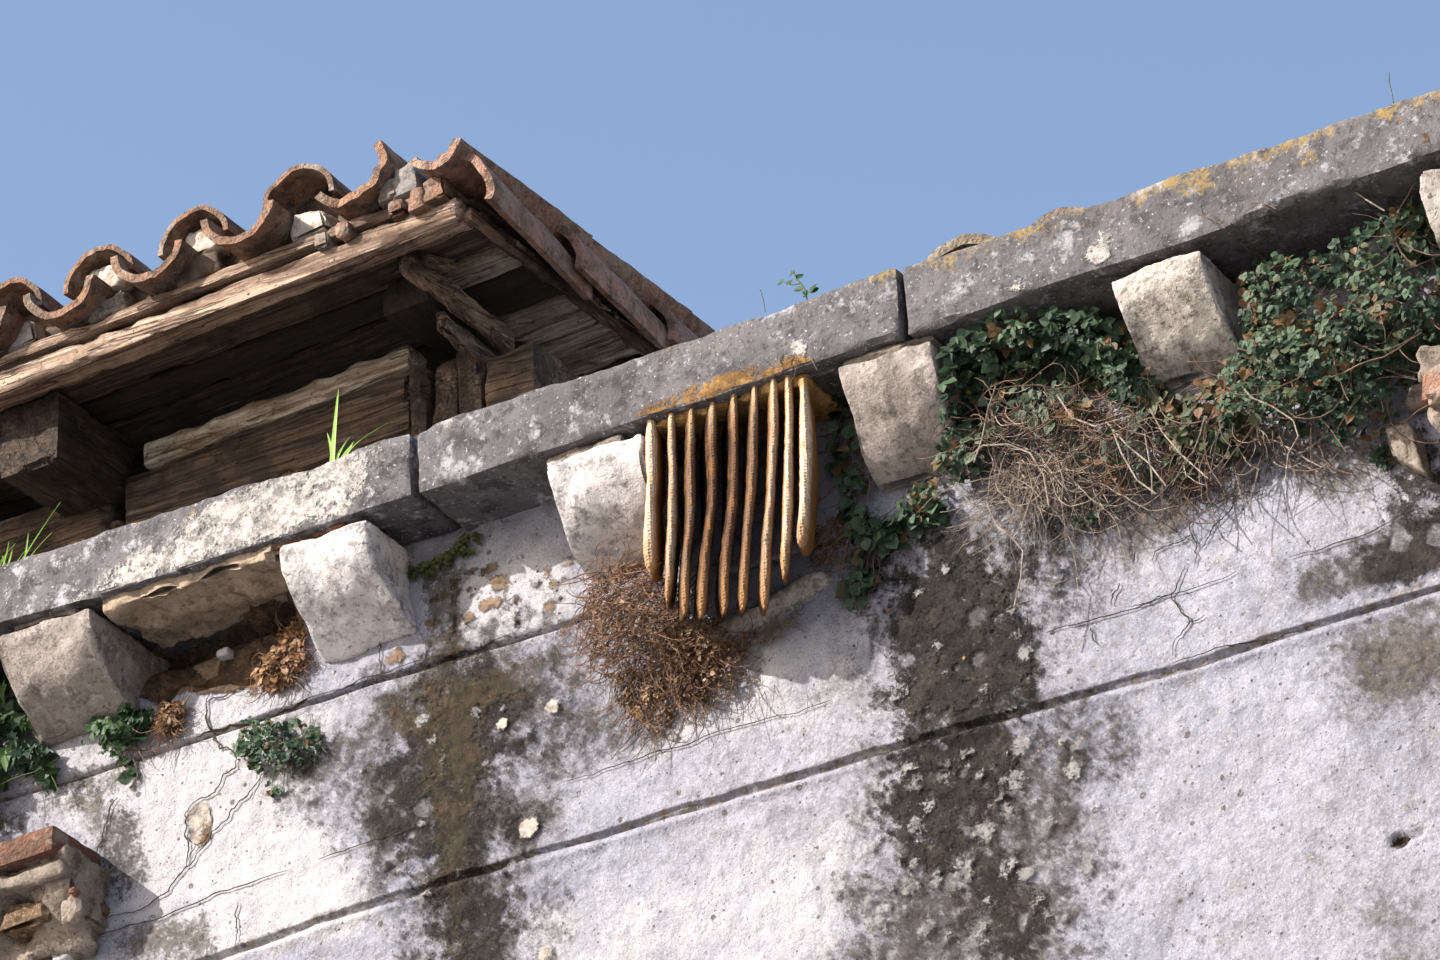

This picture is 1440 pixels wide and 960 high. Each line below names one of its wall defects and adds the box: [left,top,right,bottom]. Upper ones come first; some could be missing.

spalling [138,591,304,706]
crack [97,634,510,949]
water stain [262,604,694,960]
crack [560,700,830,783]
water stain [827,469,1259,960]
crack [1026,491,1300,698]
water stain [1274,413,1440,730]
crack [1290,505,1430,557]